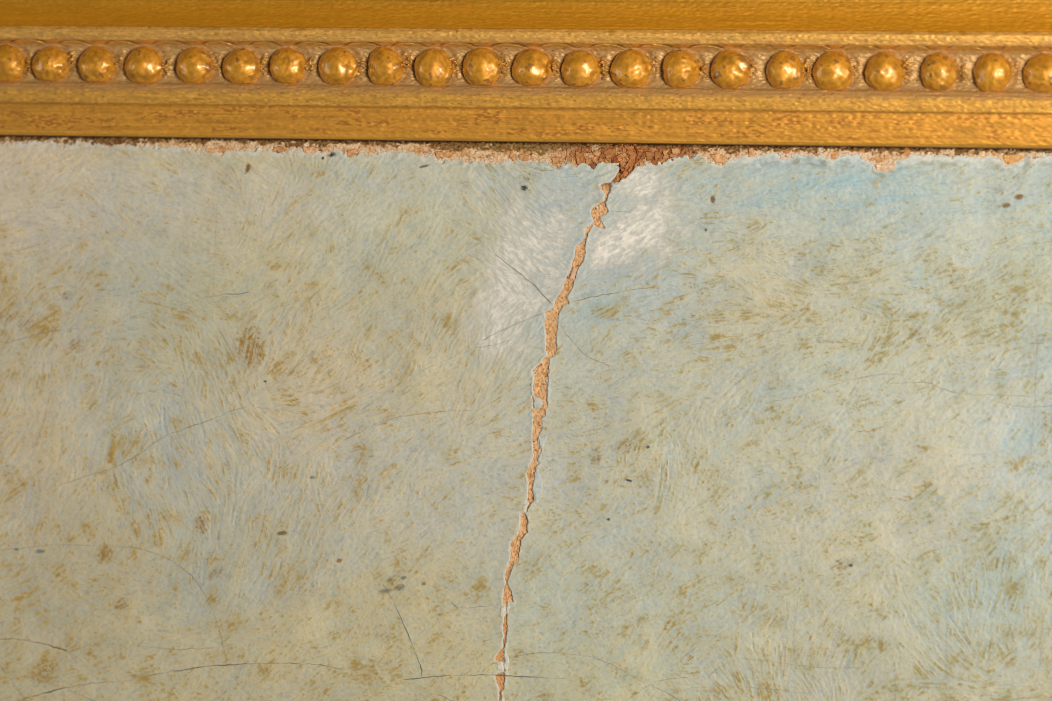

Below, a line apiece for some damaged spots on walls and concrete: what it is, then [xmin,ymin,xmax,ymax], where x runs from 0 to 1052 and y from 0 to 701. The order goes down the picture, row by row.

peeling [0,136,1052,178]
crack [0,144,824,701]
crack [769,307,1052,701]